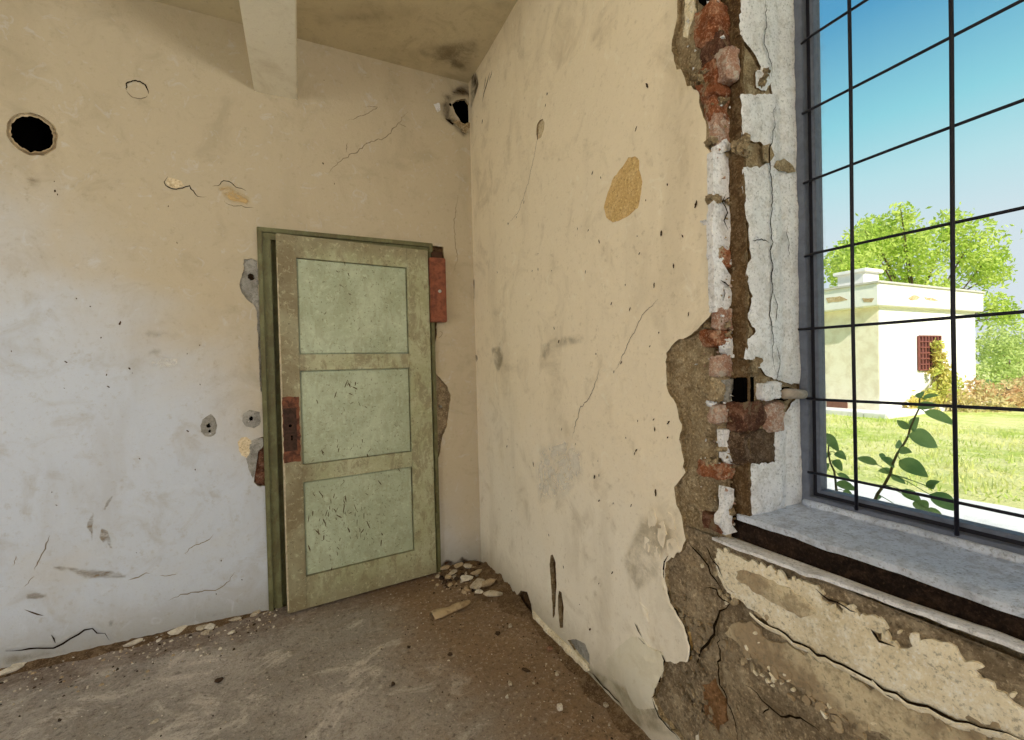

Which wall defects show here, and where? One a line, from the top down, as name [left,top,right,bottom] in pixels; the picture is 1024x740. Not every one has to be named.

crack [329,106,407,173]
spalling [434,101,483,134]
crack [753,107,790,380]
peeling [644,0,1024,740]
flaking render [436,375,450,454]
flaking render [254,437,265,486]
crack [130,534,235,600]
crack [5,610,114,651]
crack [652,545,1022,740]